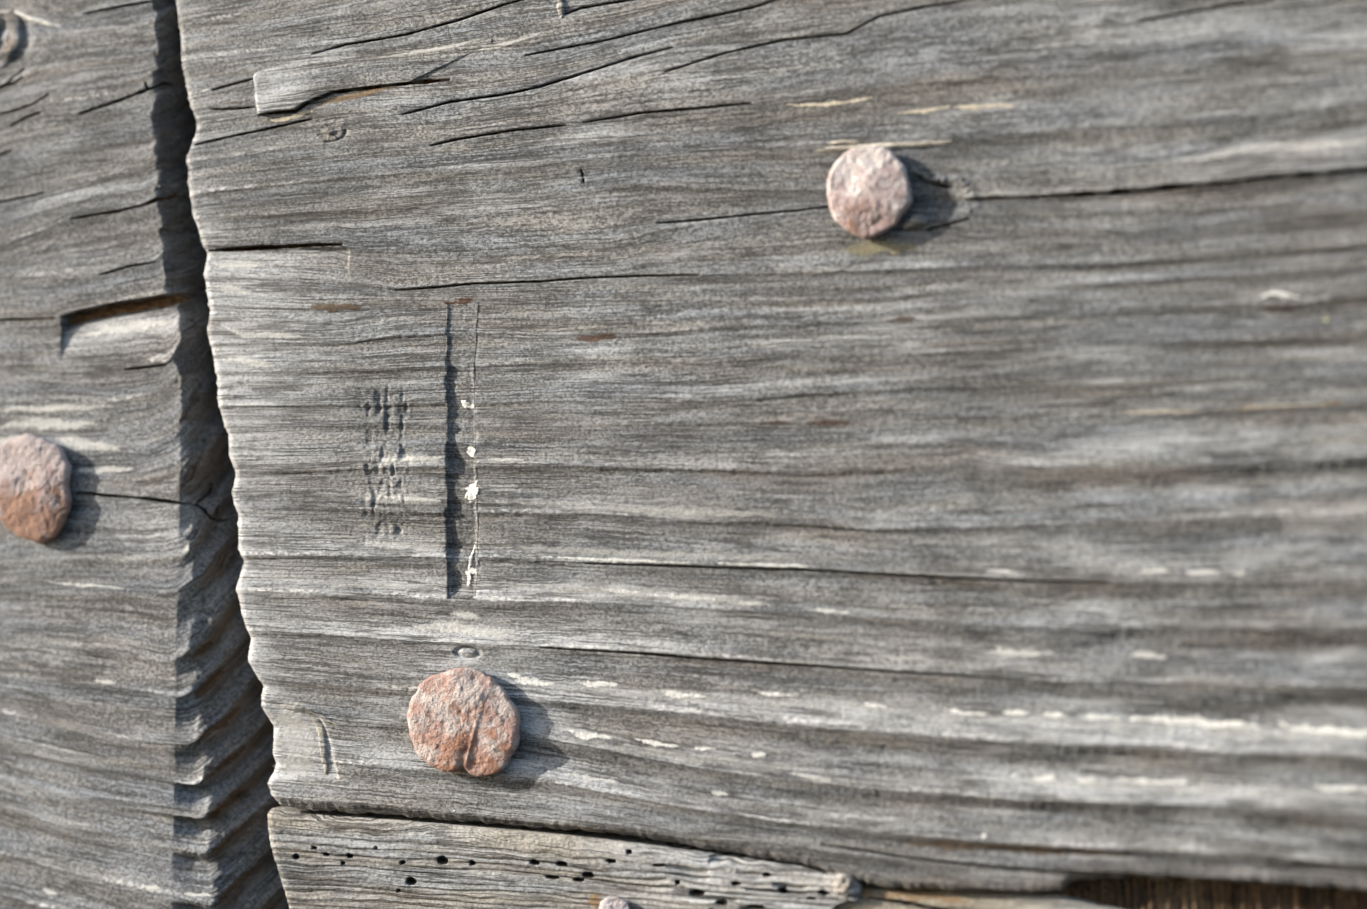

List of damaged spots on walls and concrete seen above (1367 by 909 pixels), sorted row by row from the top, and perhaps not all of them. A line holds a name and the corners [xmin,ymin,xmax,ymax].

crack [85,1,157,14]
crack [195,0,971,146]
crack [0,68,49,156]
crack [79,82,172,115]
crack [662,207,826,223]
crack [209,243,342,252]
crack [78,482,228,522]